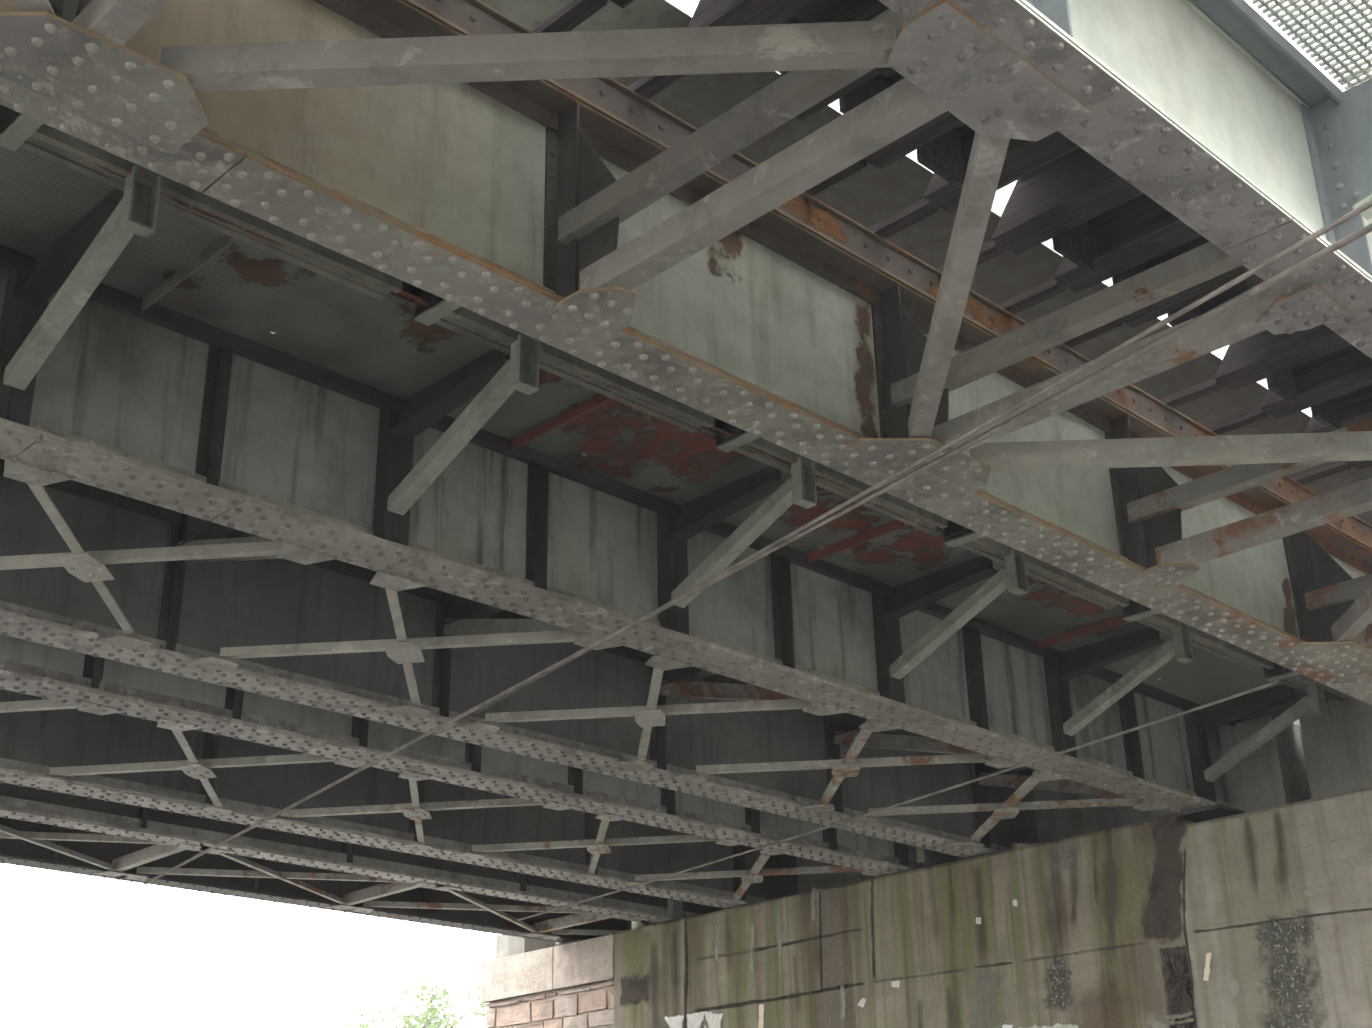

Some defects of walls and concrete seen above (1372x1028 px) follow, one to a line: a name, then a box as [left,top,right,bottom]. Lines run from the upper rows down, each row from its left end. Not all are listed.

corrosion [160,192,352,290]
corrosion [709,231,742,279]
corrosion [397,290,463,352]
corrosion [854,307,878,438]
water stain [1046,850,1076,1010]
water stain [1141,813,1187,940]